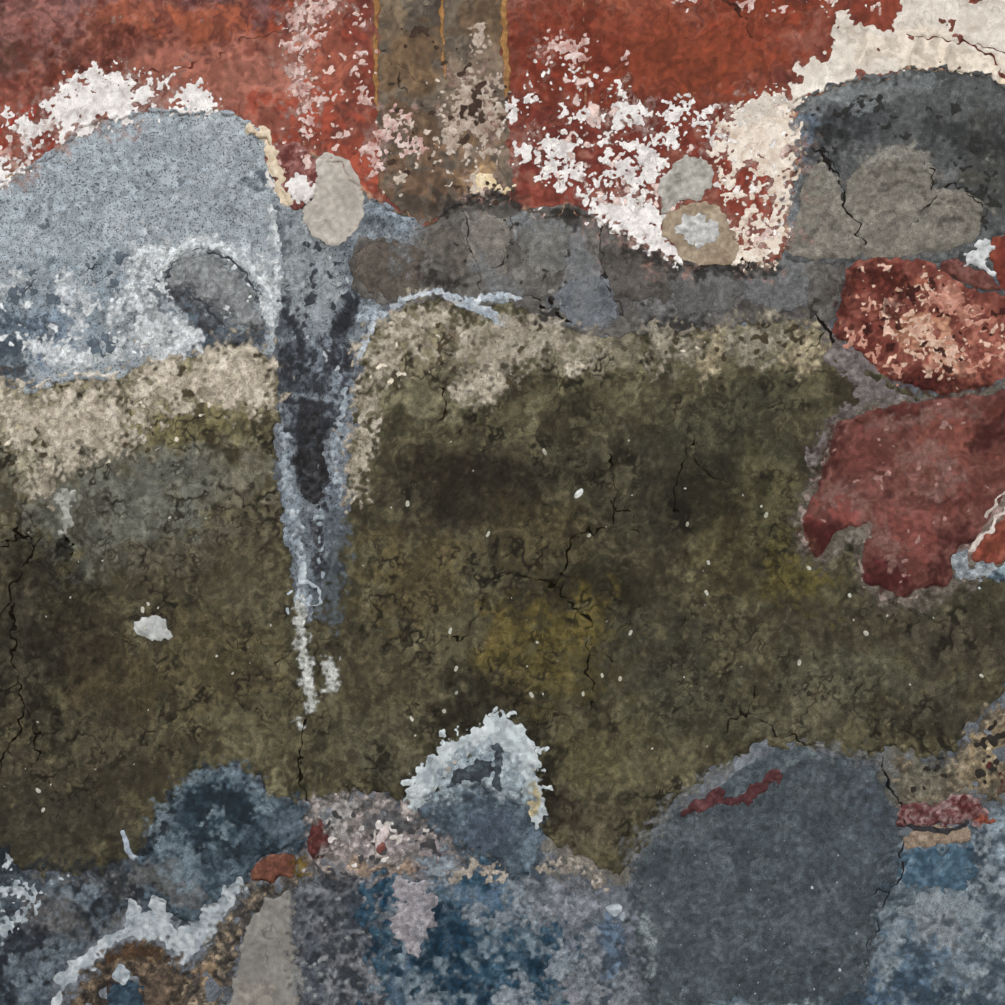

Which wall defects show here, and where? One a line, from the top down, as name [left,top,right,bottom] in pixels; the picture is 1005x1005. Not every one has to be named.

crack [811,147,867,245]
crack [906,148,987,230]
leakage [0,328,291,511]
leakage [336,301,610,513]
spalling [0,0,1005,635]
leakage [636,306,832,393]
crack [0,517,52,784]
crack [451,454,639,711]
leakage [401,706,553,830]
spalling [0,847,157,1005]
peeling [289,781,641,1005]
spalling [841,801,1005,1005]